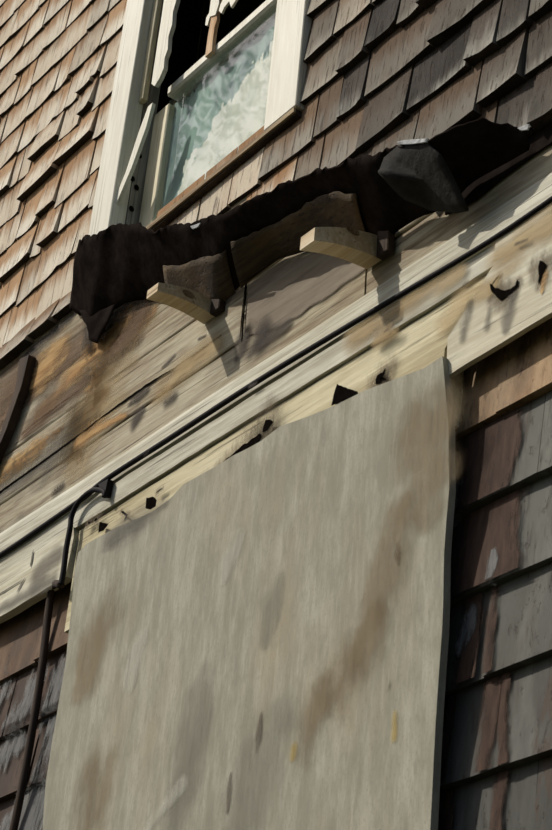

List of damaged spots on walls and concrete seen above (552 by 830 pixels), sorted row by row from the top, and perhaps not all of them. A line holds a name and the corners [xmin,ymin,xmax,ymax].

crack [488,257,552,306]
leakage [0,300,150,496]
leakage [156,335,221,406]
peeling [438,408,522,830]
peeling [0,656,66,830]